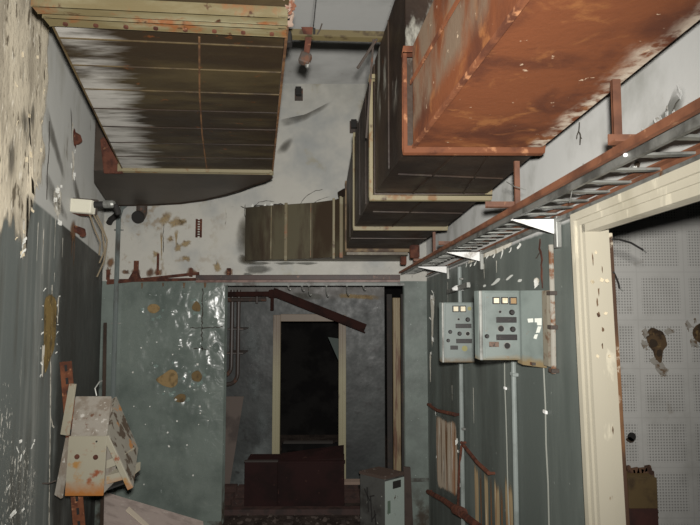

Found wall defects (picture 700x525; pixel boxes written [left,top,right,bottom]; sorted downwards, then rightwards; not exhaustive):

peeling [0,0,49,258]
damp [154,214,189,261]
spalling [641,328,675,377]
spalling [685,318,700,348]